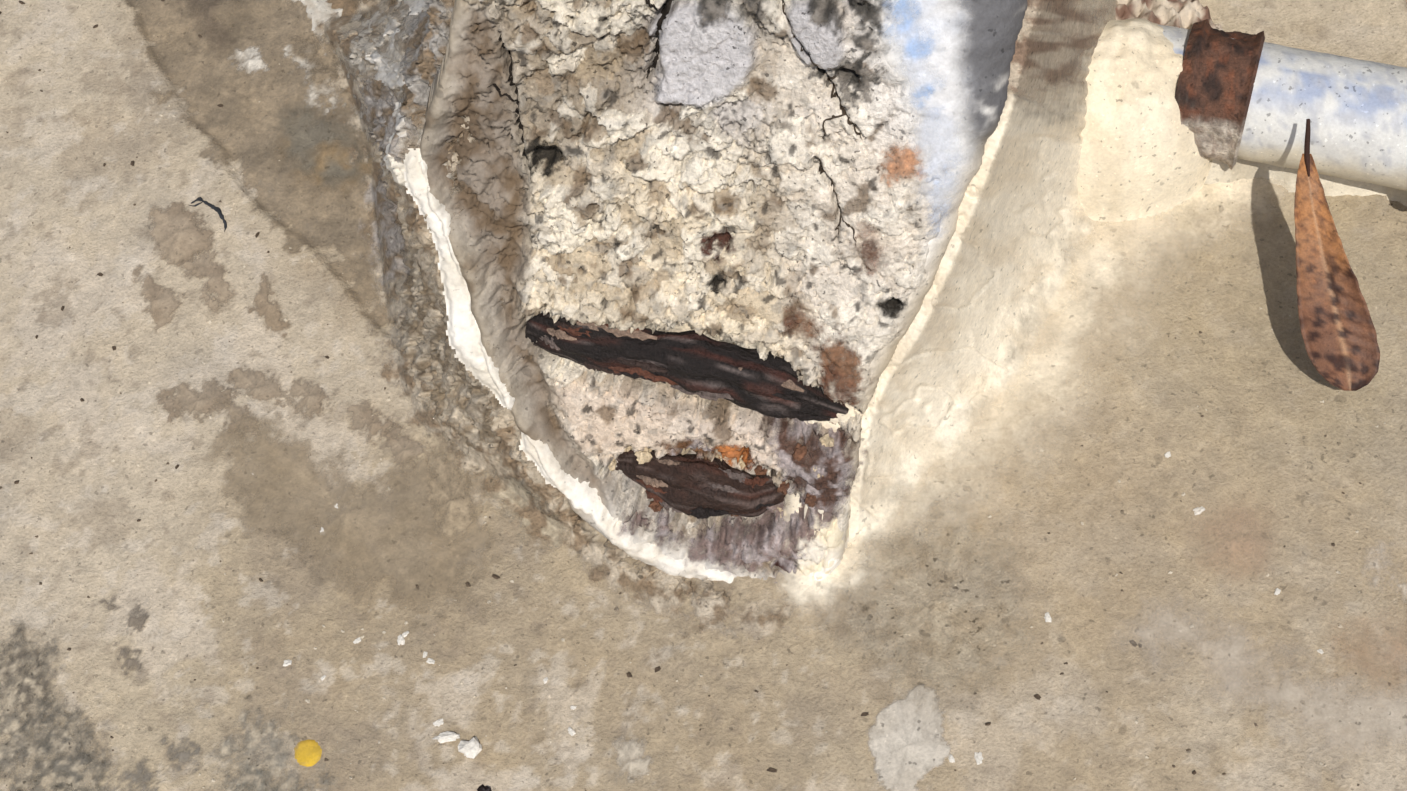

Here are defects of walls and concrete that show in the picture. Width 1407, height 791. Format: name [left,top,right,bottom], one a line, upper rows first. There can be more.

crack [487,34,531,173]
crack [645,0,674,78]
crack [782,0,869,246]
spalling [118,0,947,634]
rust [784,311,863,406]
rust [861,226,879,275]
rust [621,416,866,583]